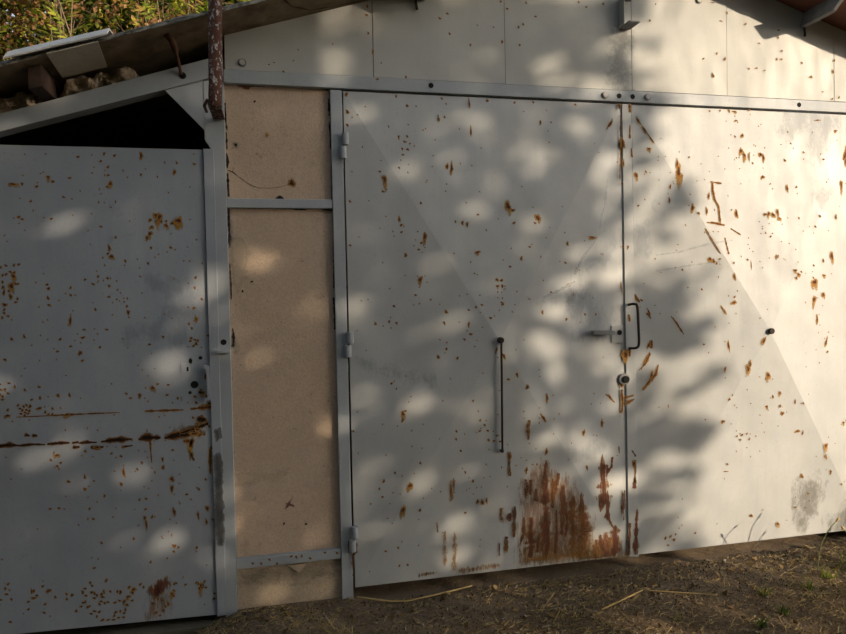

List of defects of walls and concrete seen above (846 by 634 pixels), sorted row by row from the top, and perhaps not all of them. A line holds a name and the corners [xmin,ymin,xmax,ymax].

corrosion [668,151,690,203]
corrosion [0,263,21,321]
corrosion [40,310,109,362]
corrosion [84,213,197,318]
corrosion [187,276,209,348]
corrosion [793,252,834,353]
corrosion [0,365,212,559]
corrosion [436,394,640,574]
corrosion [23,576,216,622]